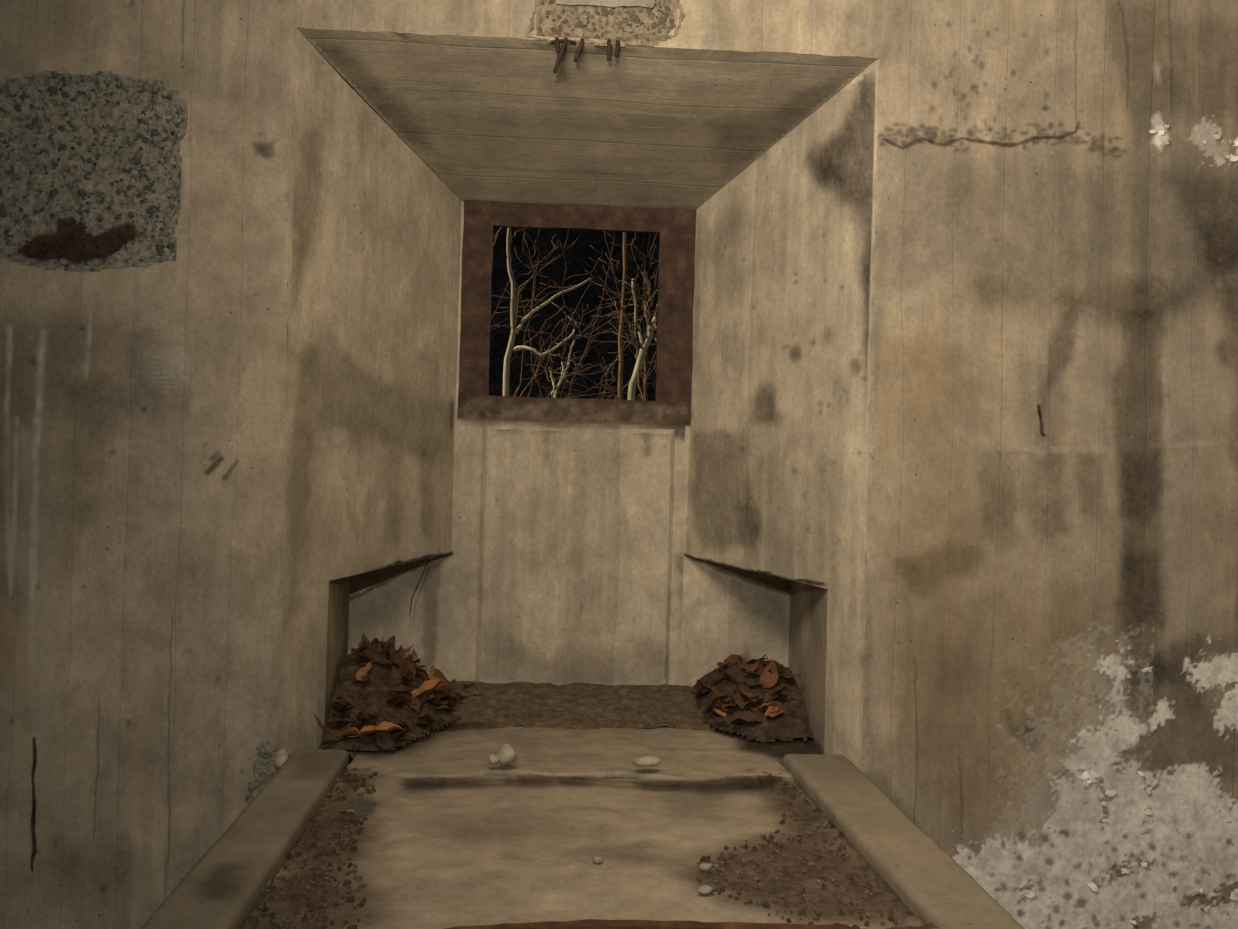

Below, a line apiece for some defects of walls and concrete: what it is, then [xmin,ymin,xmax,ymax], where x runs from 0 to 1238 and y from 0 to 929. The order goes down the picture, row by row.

spalling [525,0,685,47]
crack [886,131,1074,146]
spalling [0,70,188,272]
corrosion [19,218,139,263]
crack [30,738,38,871]